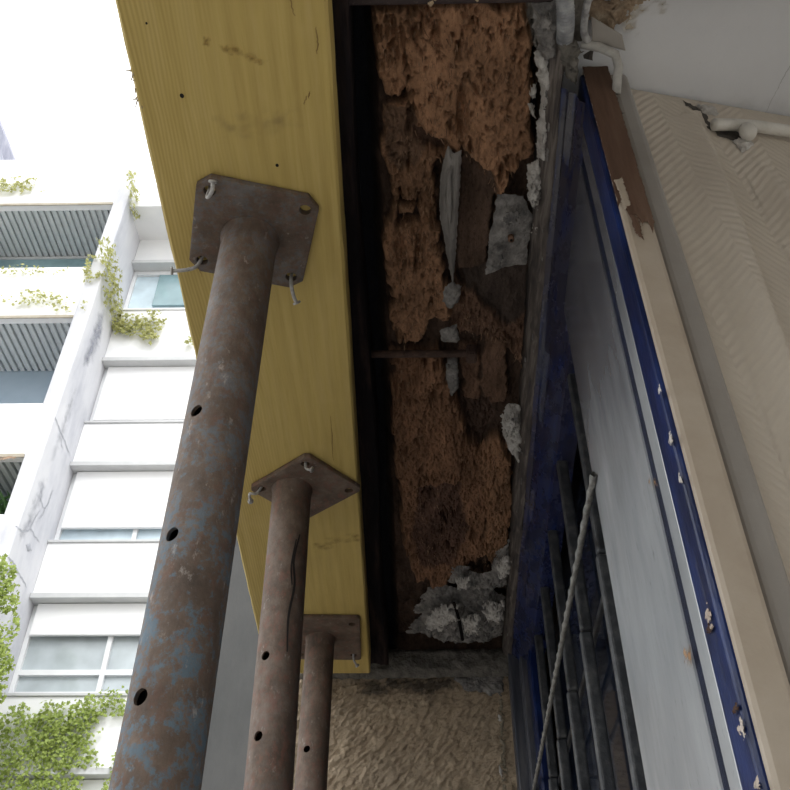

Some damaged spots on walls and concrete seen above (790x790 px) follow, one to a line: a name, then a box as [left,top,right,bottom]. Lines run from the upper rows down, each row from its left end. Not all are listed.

peeling [485,0,655,275]
spalling [683,100,754,153]
flaking render [442,282,461,309]
flaking render [440,324,460,343]
flaking render [446,364,459,396]
flaking render [500,403,525,463]
flaking render [406,539,512,644]
peeling [705,602,714,634]
peeling [732,702,746,740]